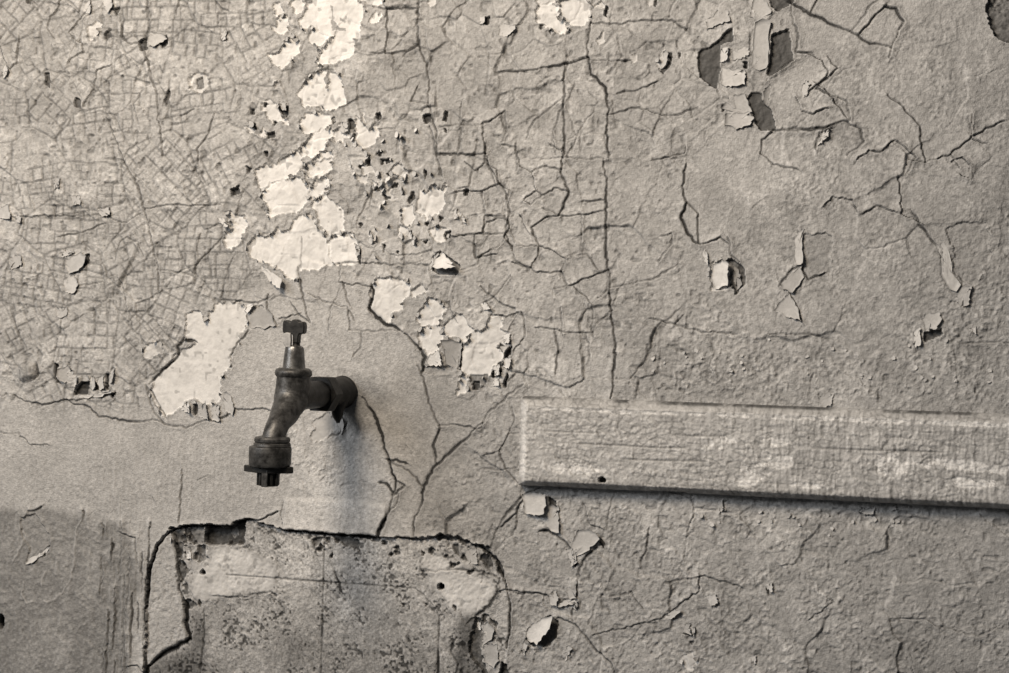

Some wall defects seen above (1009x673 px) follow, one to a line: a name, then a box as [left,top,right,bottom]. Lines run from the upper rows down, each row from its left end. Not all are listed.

crack [0,36,20,71]
crack [13,0,424,358]
peeling [218,0,466,288]
crack [373,0,740,397]
peeling [698,0,795,131]
crack [759,0,1006,225]
crack [0,385,270,430]
peeling [141,301,275,422]
peeling [368,275,513,396]
flaking render [143,520,512,673]
crack [99,365,742,673]
peeling [521,491,606,655]